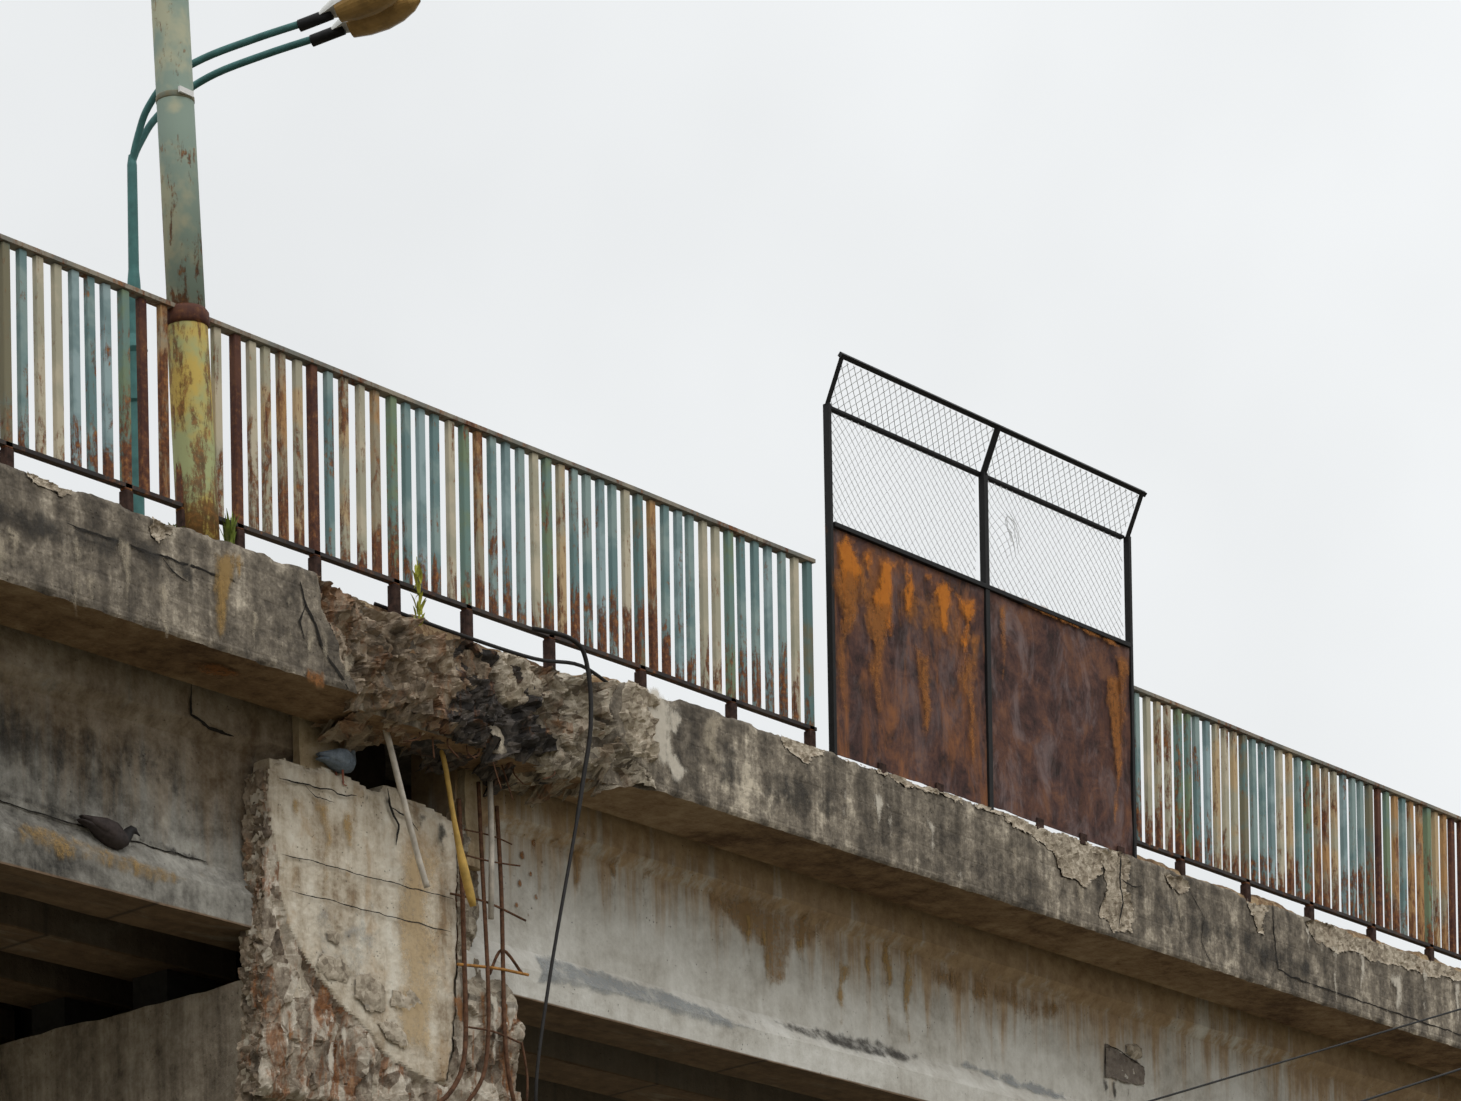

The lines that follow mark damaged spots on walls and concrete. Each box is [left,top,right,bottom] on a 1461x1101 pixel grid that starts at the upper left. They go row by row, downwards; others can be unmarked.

corrosion [215,556,241,632]
crack [299,581,349,689]
corrosion [836,537,978,753]
corrosion [1027,600,1128,781]
crack [130,840,206,862]
spalling [234,574,684,1101]
spalling [845,759,1134,933]
water stain [537,957,732,1026]
water stain [789,1025,909,1060]
water stain [964,1063,1059,1098]
crack [1272,903,1461,1035]
water stain [1391,976,1401,1008]